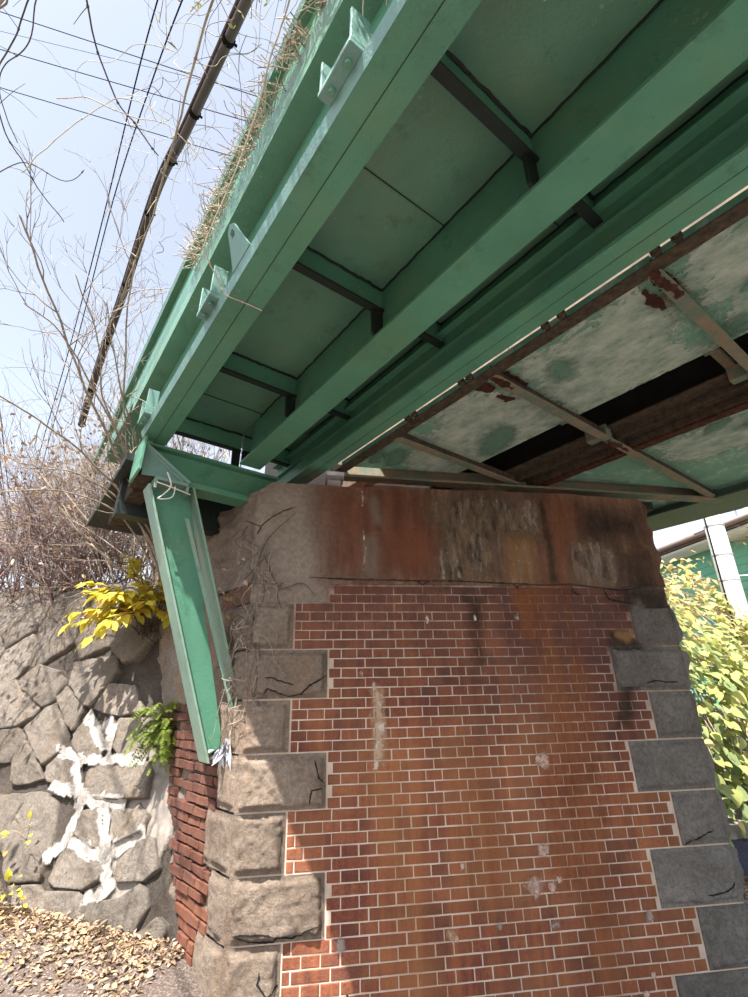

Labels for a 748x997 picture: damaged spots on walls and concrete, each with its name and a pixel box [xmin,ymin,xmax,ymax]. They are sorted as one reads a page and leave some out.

corrosion [641,268,685,311]
peeling [666,216,748,338]
corrosion [475,371,528,402]
peeling [369,279,720,473]
peeling [647,414,748,465]
crack [263,676,325,697]
crack [646,678,677,686]
crack [309,760,324,804]
spalling [524,876,562,898]
crack [708,881,735,896]
crack [231,927,318,944]
crack [256,974,278,997]